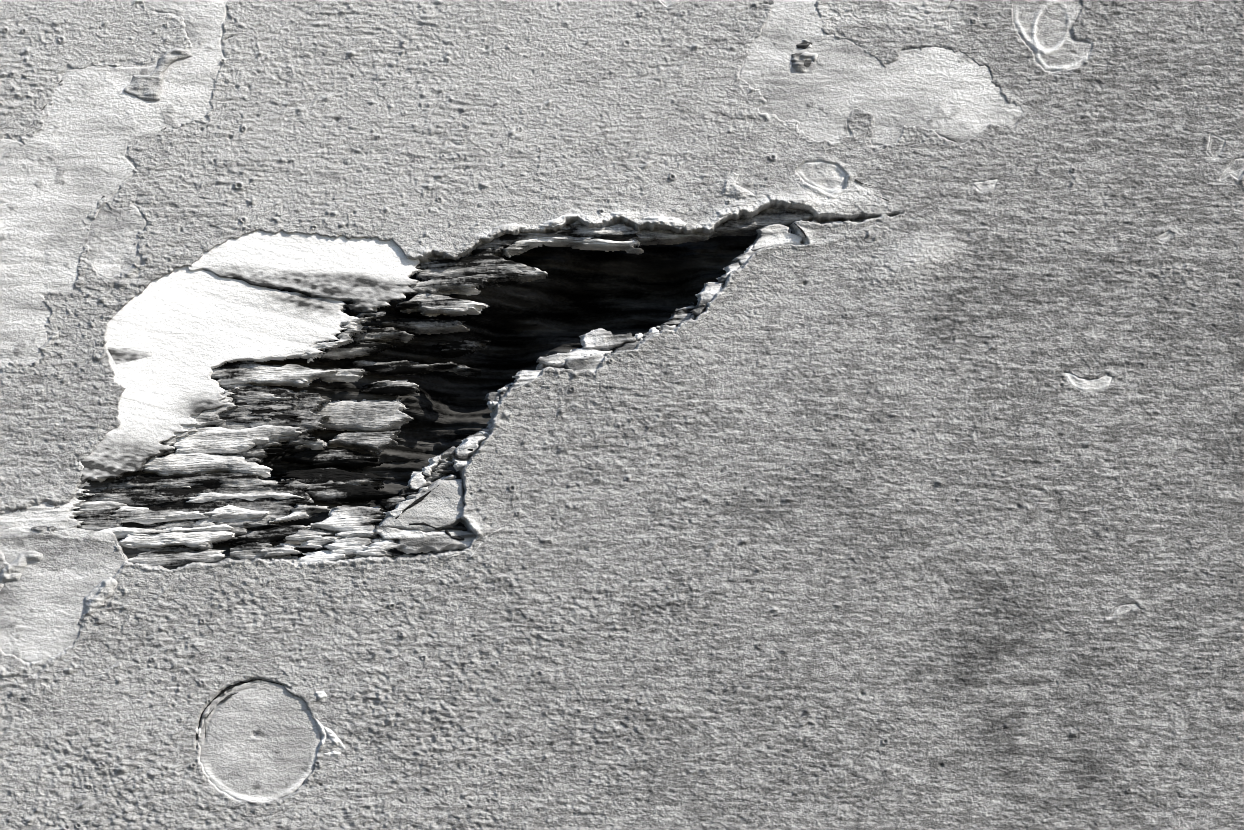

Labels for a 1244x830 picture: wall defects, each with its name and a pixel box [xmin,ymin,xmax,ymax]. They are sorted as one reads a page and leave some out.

peeling [739,0,1029,145]
peeling [0,0,233,370]
peeling [643,205,689,227]
peeling [711,172,756,218]
peeling [789,161,863,235]
spalling [212,212,808,558]
peeling [0,471,157,662]